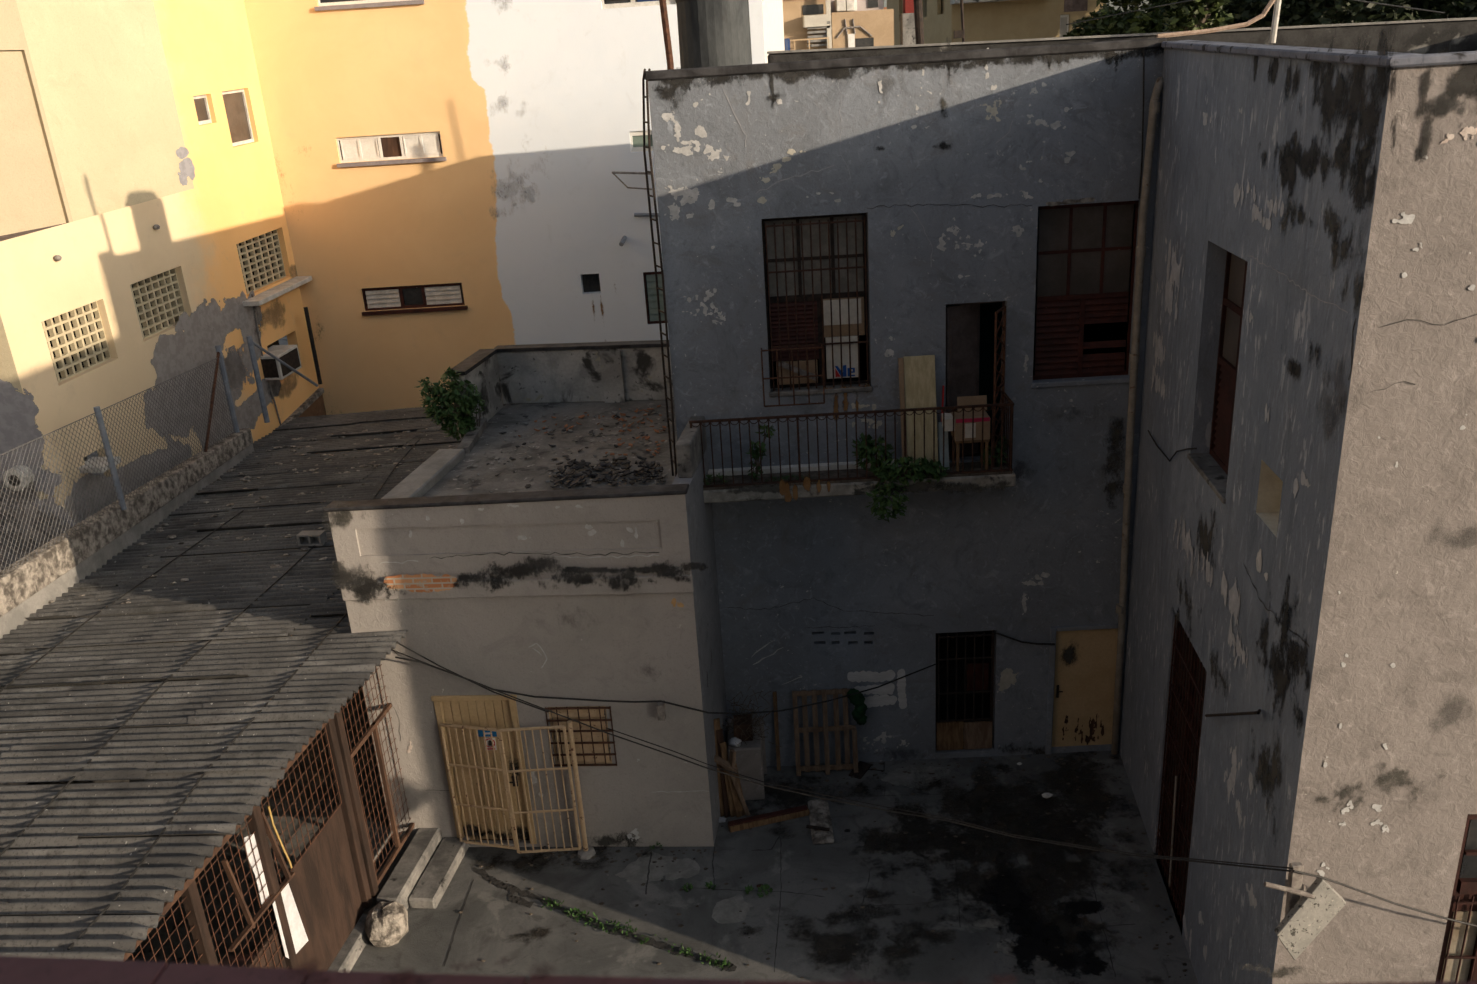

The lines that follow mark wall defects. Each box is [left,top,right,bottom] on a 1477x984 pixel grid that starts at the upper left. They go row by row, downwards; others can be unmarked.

peeling [661,113,729,161]
peeling [664,149,806,221]
damp [1253,10,1397,310]
damp [1415,63,1477,161]
crack [1251,256,1477,394]
flaking render [363,574,457,603]
damp [453,556,707,591]
damp [1256,575,1310,729]
damp [1251,731,1281,833]
damp [790,744,1135,984]